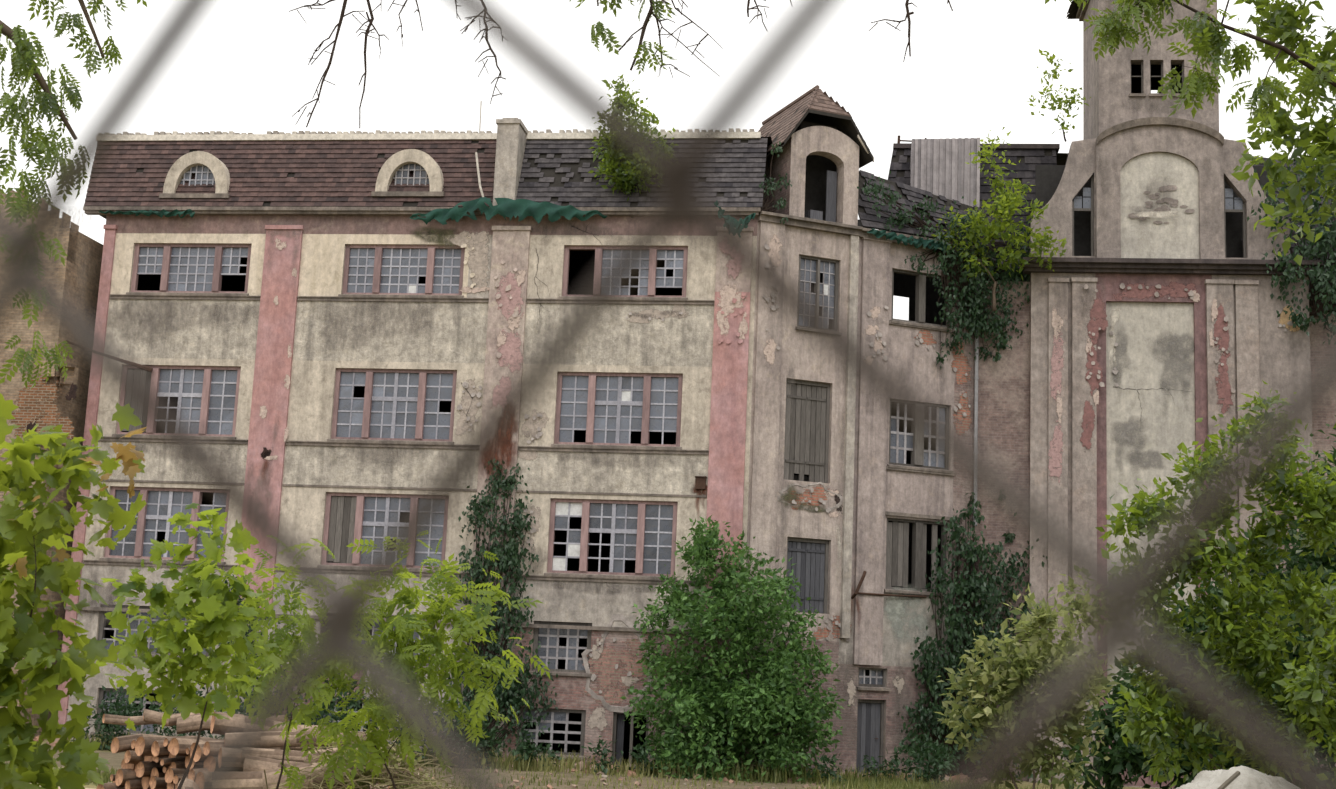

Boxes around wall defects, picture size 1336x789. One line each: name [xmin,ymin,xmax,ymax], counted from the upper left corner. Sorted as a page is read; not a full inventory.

leakage [1137,207,1172,217]
peeling [716,261,749,344]
peeling [763,328,780,365]
leakage [1113,332,1127,377]
peeling [1080,282,1236,452]
peeling [1048,307,1065,484]
leakage [1114,421,1162,468]
spalling [777,482,843,517]
spalling [582,614,656,731]